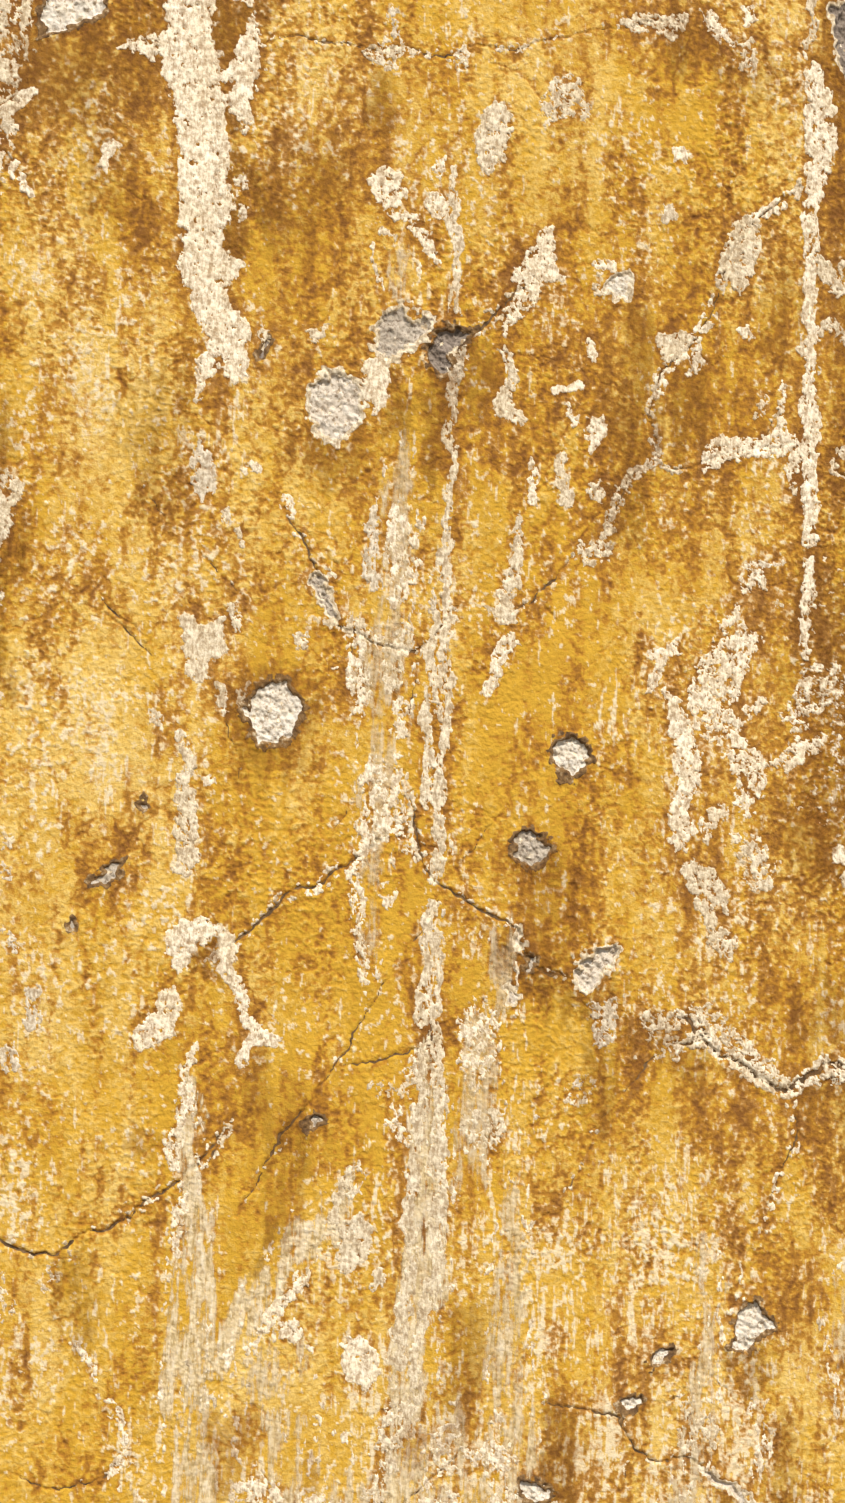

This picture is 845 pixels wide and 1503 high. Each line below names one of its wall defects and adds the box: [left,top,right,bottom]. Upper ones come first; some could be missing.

peeling [116,0,276,404]
peeling [0,468,25,562]
crack [453,273,542,382]
peeling [550,380,608,455]
crack [506,178,804,620]
peeling [645,0,845,963]
peeling [132,155,566,1503]
crack [203,790,567,981]
spalling [546,731,597,785]
spalling [571,943,626,1049]
crack [0,1116,233,1259]
crack [589,1008,845,1234]